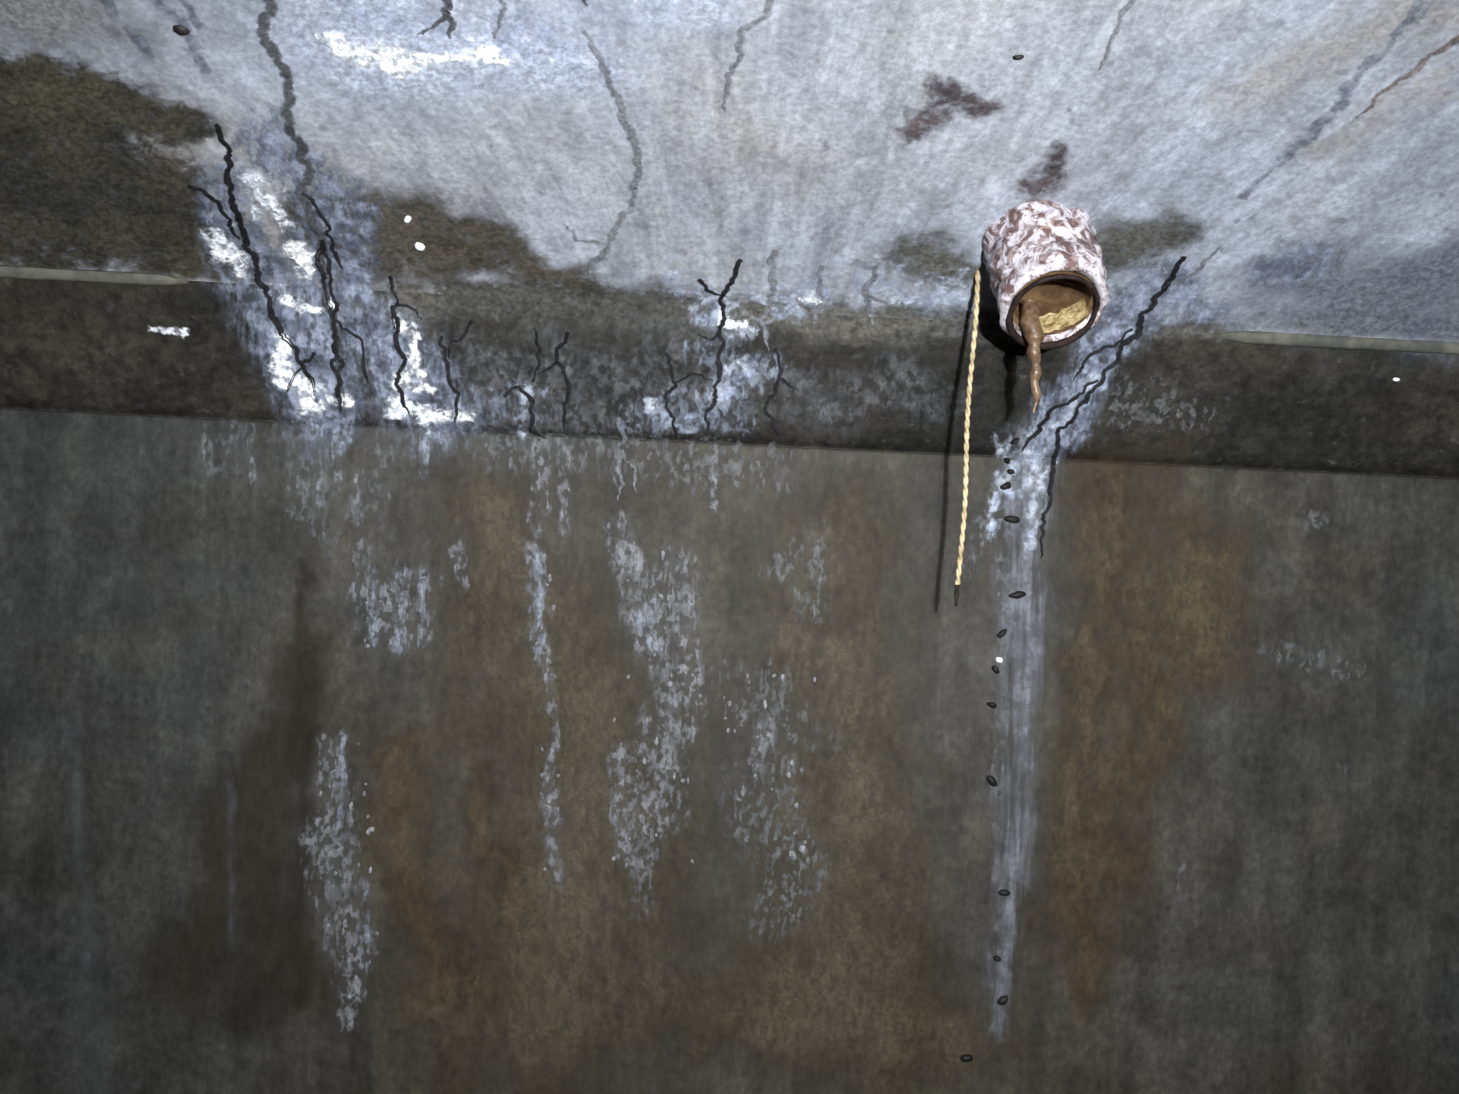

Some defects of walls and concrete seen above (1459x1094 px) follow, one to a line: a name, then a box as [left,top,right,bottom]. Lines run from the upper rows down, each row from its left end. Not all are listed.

leakage [158,0,210,71]
crack [188,0,473,423]
leakage [0,53,1027,566]
crack [504,328,572,439]
crack [567,0,643,277]
crack [664,249,799,438]
crack [862,265,889,325]
rust [898,79,999,141]
crack [1022,246,1221,559]
leakage [1269,55,1383,172]
leakage [1250,243,1459,339]
leakage [396,213,1230,1094]